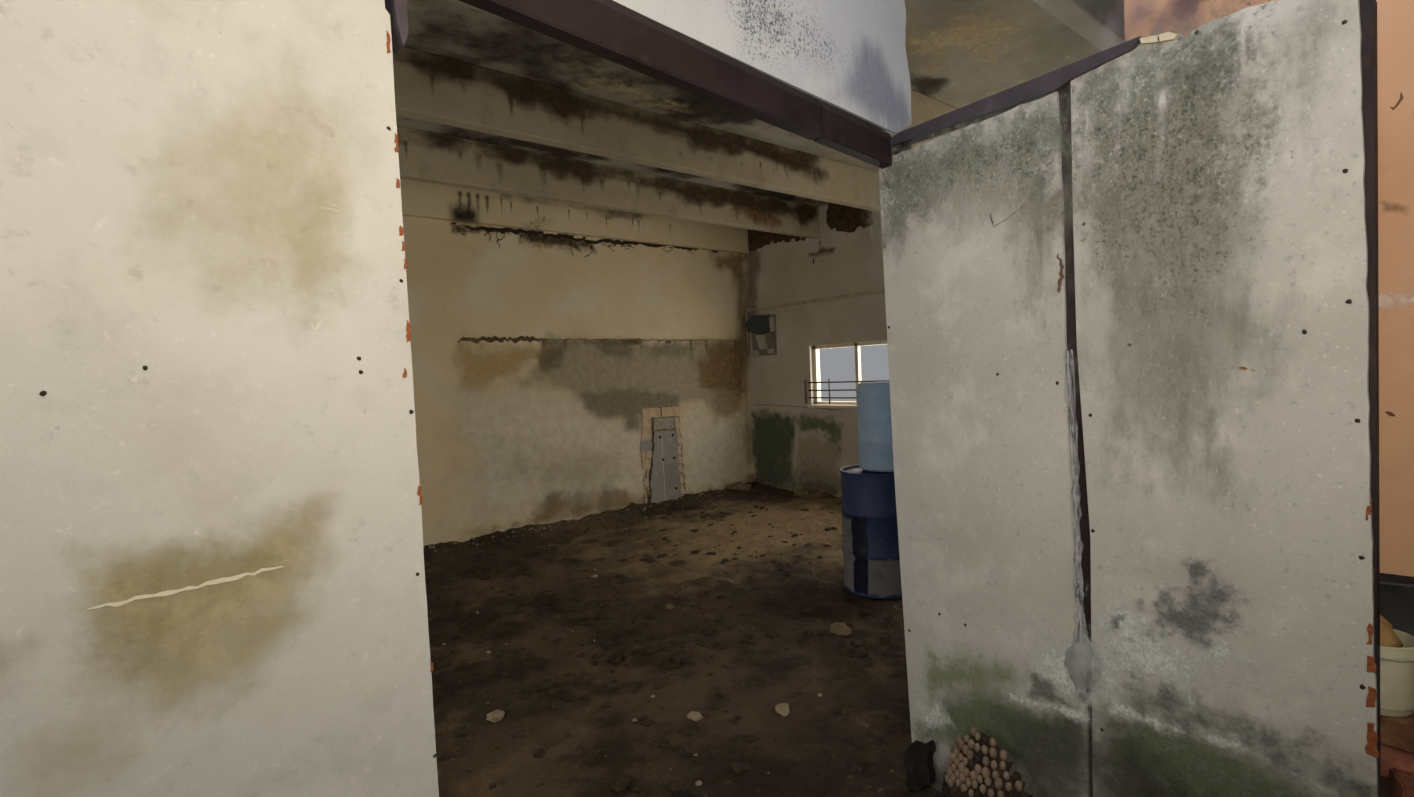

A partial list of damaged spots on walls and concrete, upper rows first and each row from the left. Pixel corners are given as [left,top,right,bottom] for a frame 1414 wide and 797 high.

damp [407,21,824,180]
damp [732,0,831,58]
damp [427,128,817,224]
damp [874,15,1270,421]
damp [87,532,299,677]
damp [919,703,951,728]
damp [1008,562,1308,781]